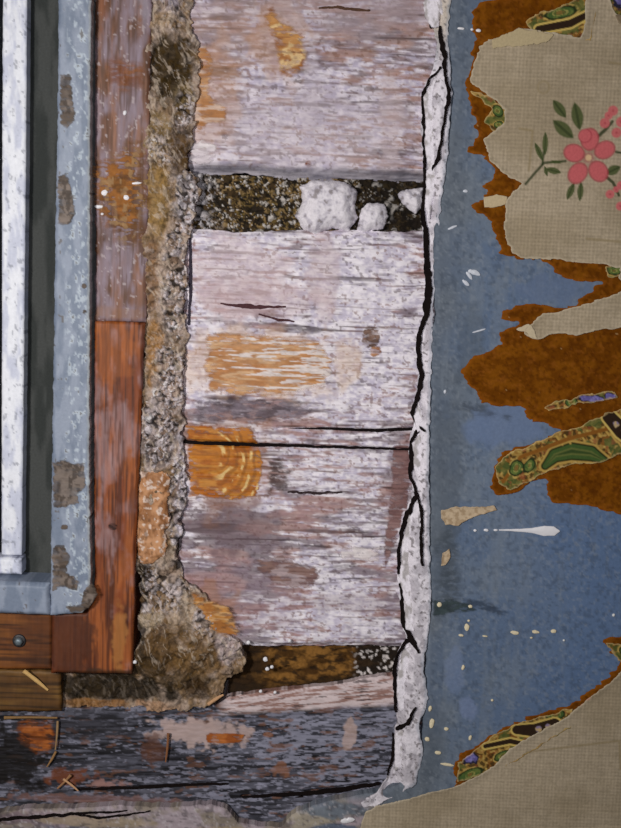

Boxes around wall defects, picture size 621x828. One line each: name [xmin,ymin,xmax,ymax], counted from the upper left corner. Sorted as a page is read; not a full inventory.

crack [319,4,370,12]
peeling [492,28,554,48]
peeling [484,194,507,208]
peeling [517,324,537,339]
crack [73,24,451,804]
peeling [52,461,85,508]
crack [0,810,151,822]